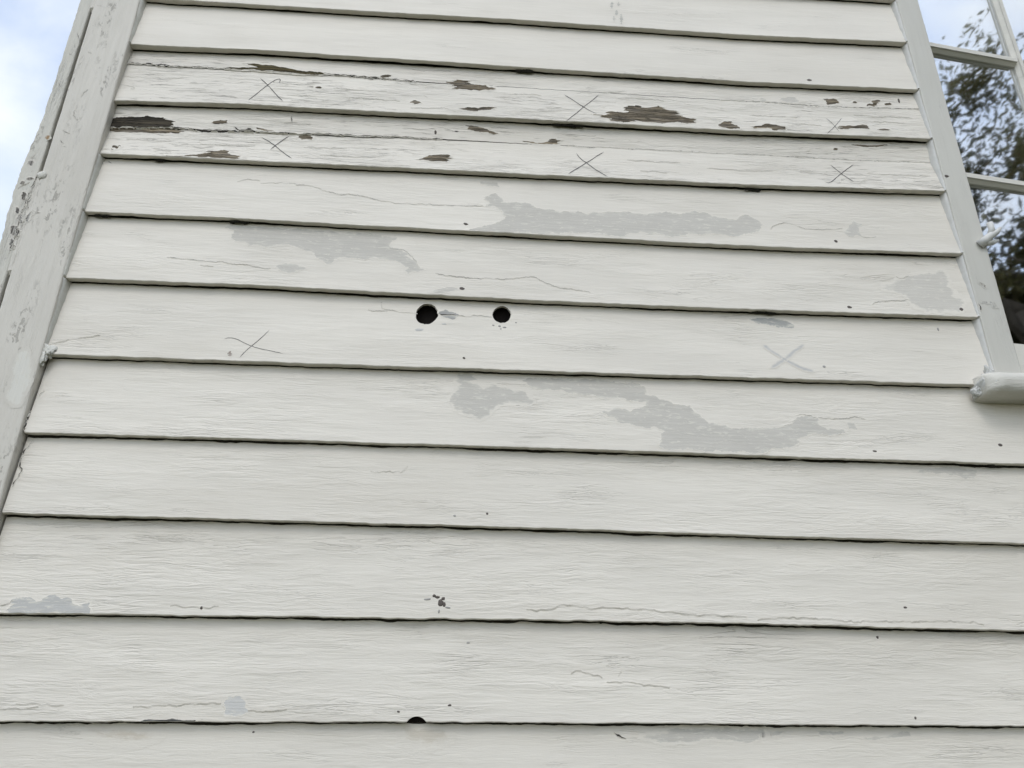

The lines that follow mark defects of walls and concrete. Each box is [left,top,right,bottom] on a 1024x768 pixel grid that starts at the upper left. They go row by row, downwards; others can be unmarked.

peeling [445,79,496,92]
peeling [162,149,247,160]
peeling [109,118,443,151]
peeling [416,153,454,163]
peeling [586,104,697,125]
peeling [567,123,927,163]
peeling [716,120,787,132]
crack [237,179,482,207]
peeling [465,180,764,239]
peeling [224,223,427,275]
peeling [446,373,848,455]
peeling [3,593,93,614]